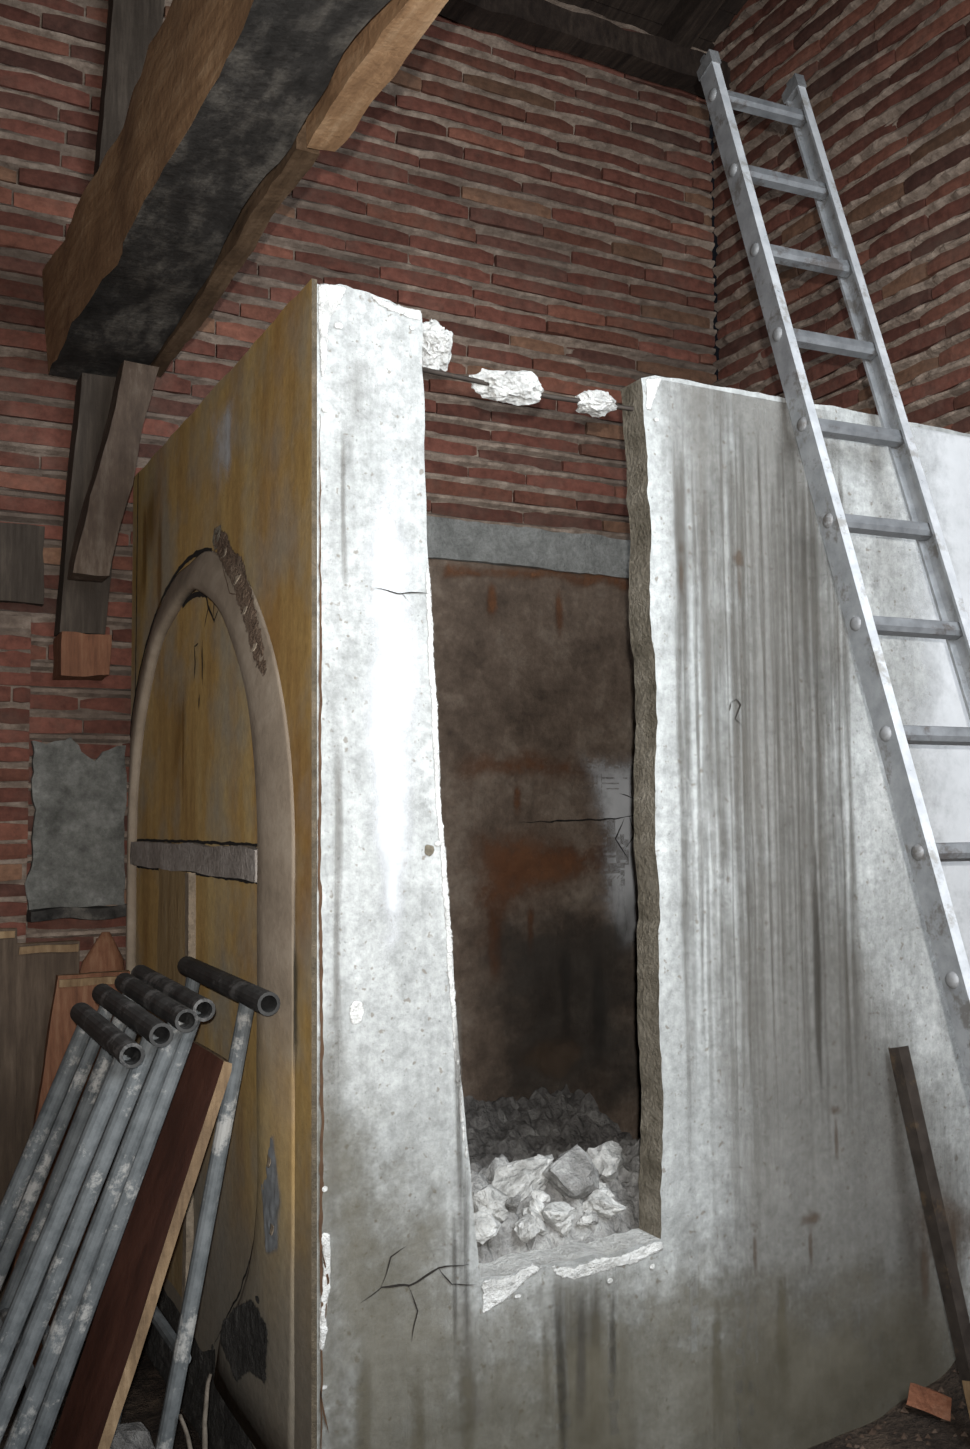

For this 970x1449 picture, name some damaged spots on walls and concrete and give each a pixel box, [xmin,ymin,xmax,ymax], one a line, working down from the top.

spalling [318,284,346,381]
spalling [365,293,421,330]
crack [378,588,423,599]
crack [318,417,329,1449]
leakage [317,389,955,1449]
crack [362,1247,469,1337]